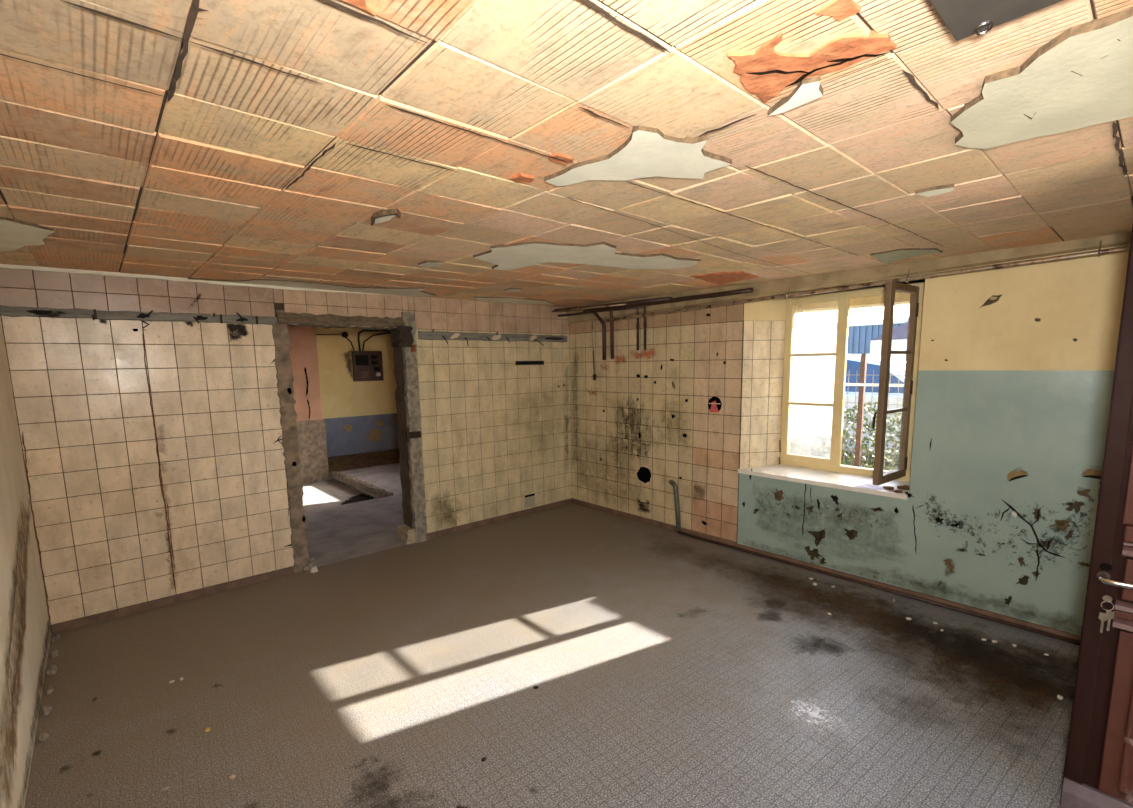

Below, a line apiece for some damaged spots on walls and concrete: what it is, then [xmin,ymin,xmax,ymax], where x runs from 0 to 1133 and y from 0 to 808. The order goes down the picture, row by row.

spalling [815,0,861,22]
spalling [728,30,897,102]
spalling [548,153,574,165]
crack [142,321,176,590]
water stain [615,402,647,454]
peeling [773,488,859,565]
peeling [1007,467,1030,481]
crack [1000,499,1065,581]
peeling [1033,465,1102,550]
peeling [1004,555,1041,605]